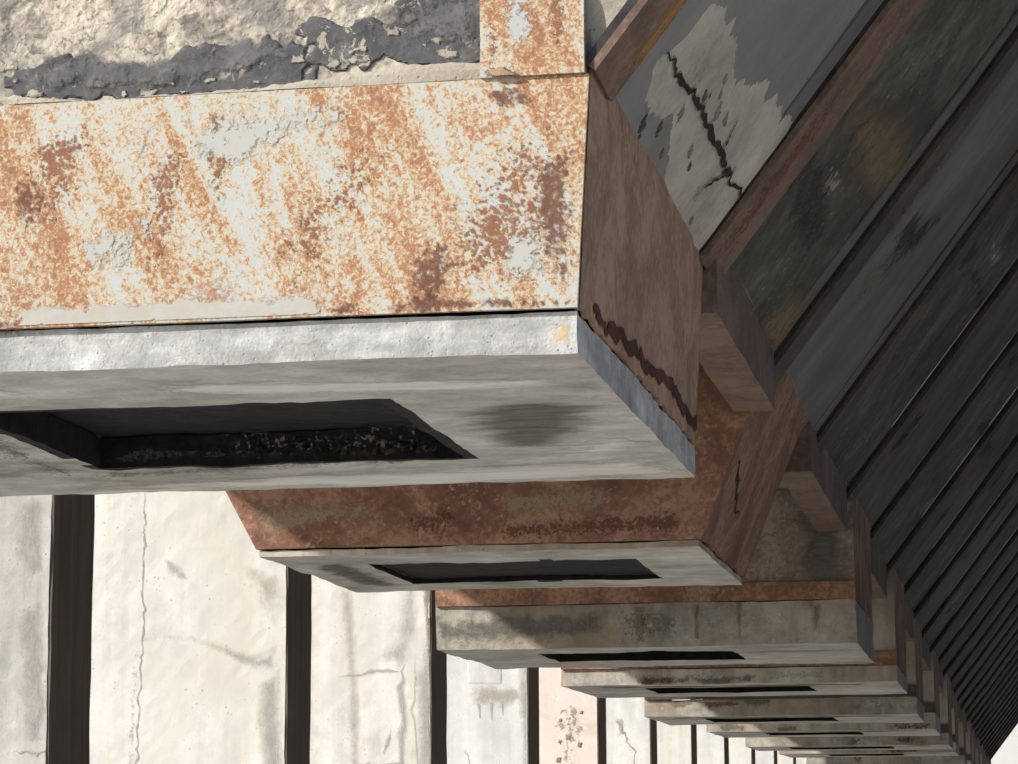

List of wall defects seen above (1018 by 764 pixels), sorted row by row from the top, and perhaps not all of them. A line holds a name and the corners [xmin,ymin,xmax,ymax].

rust [15,125,91,231]
rust [141,148,192,275]
peeling [0,0,518,106]
rust [277,147,390,293]
rust [392,125,574,315]
rust [488,88,530,107]
peeling [585,0,627,53]
crack [667,52,743,208]
peeling [637,3,792,251]
crack [135,500,146,763]
crack [339,666,405,764]
peeling [556,706,583,762]